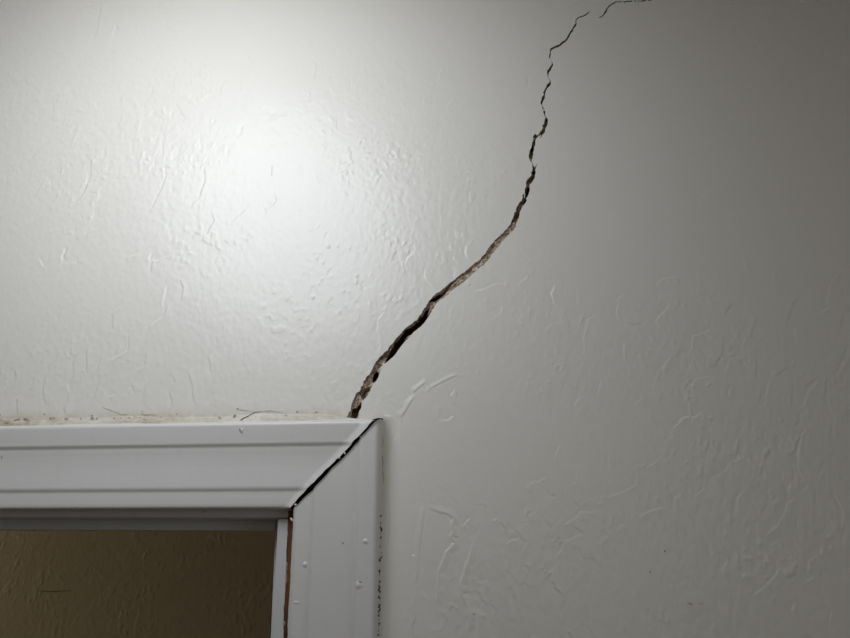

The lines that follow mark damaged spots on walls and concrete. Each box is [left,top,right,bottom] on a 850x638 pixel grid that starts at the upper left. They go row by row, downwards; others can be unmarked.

crack [347,0,651,483]